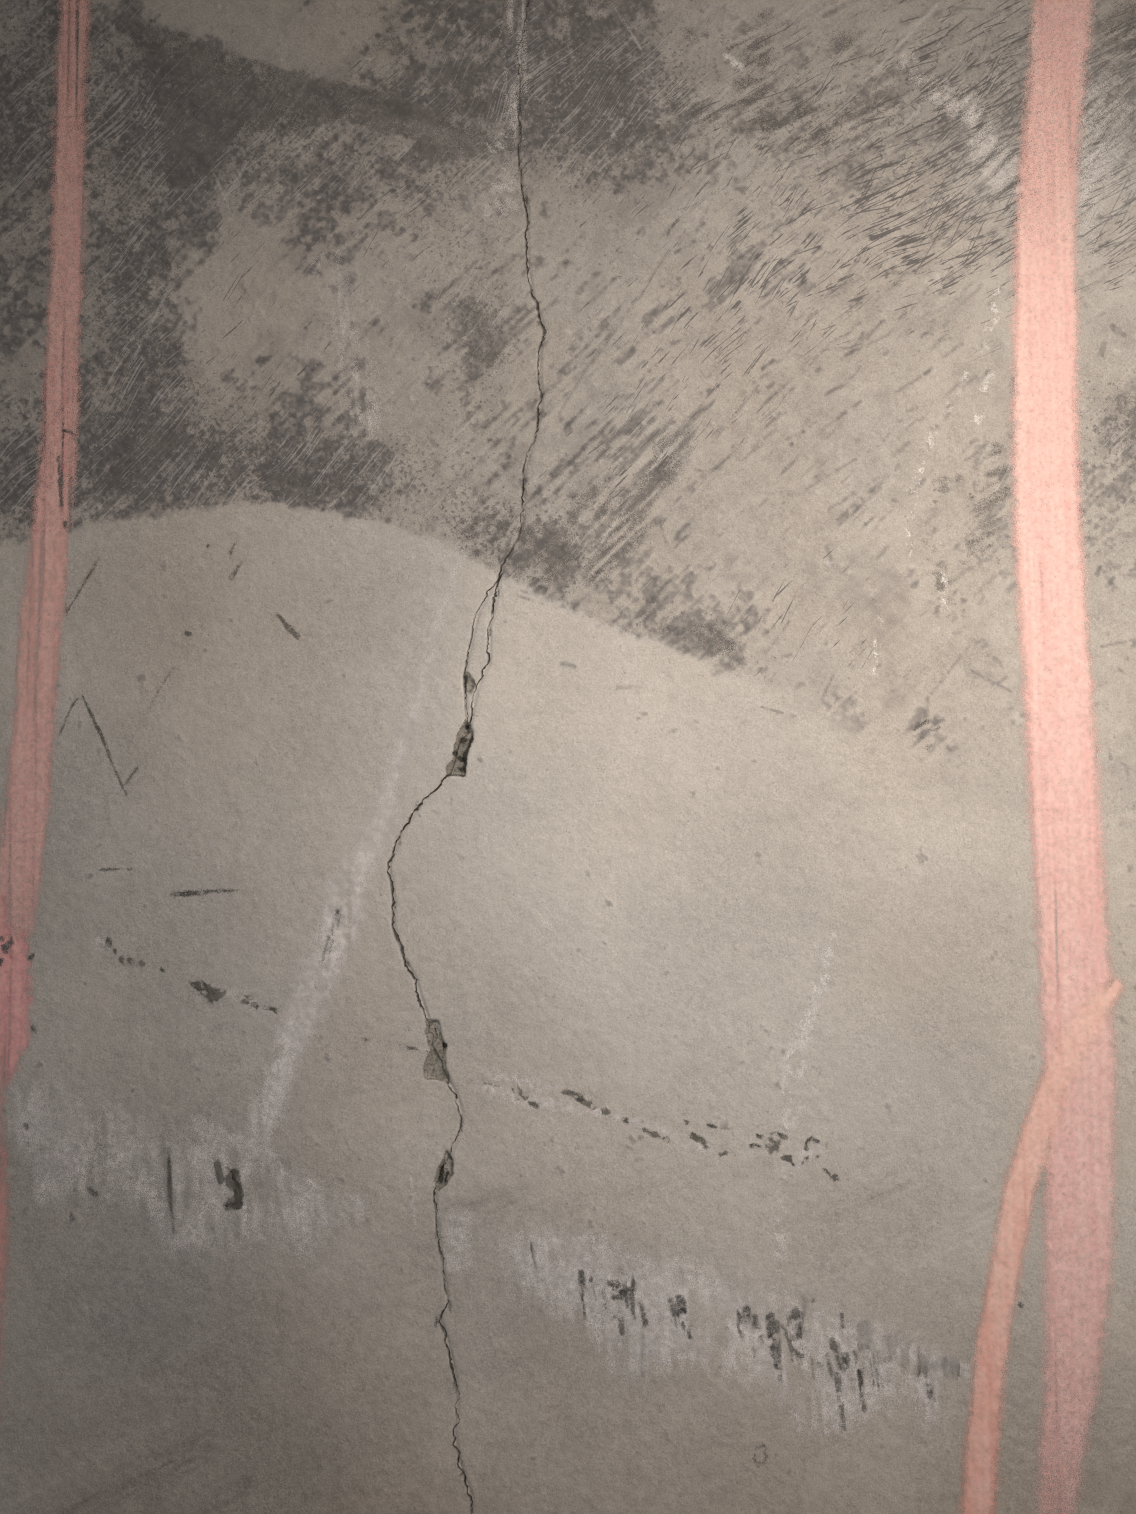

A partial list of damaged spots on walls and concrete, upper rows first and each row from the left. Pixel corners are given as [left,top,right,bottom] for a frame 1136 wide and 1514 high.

crack [387,1,547,1514]